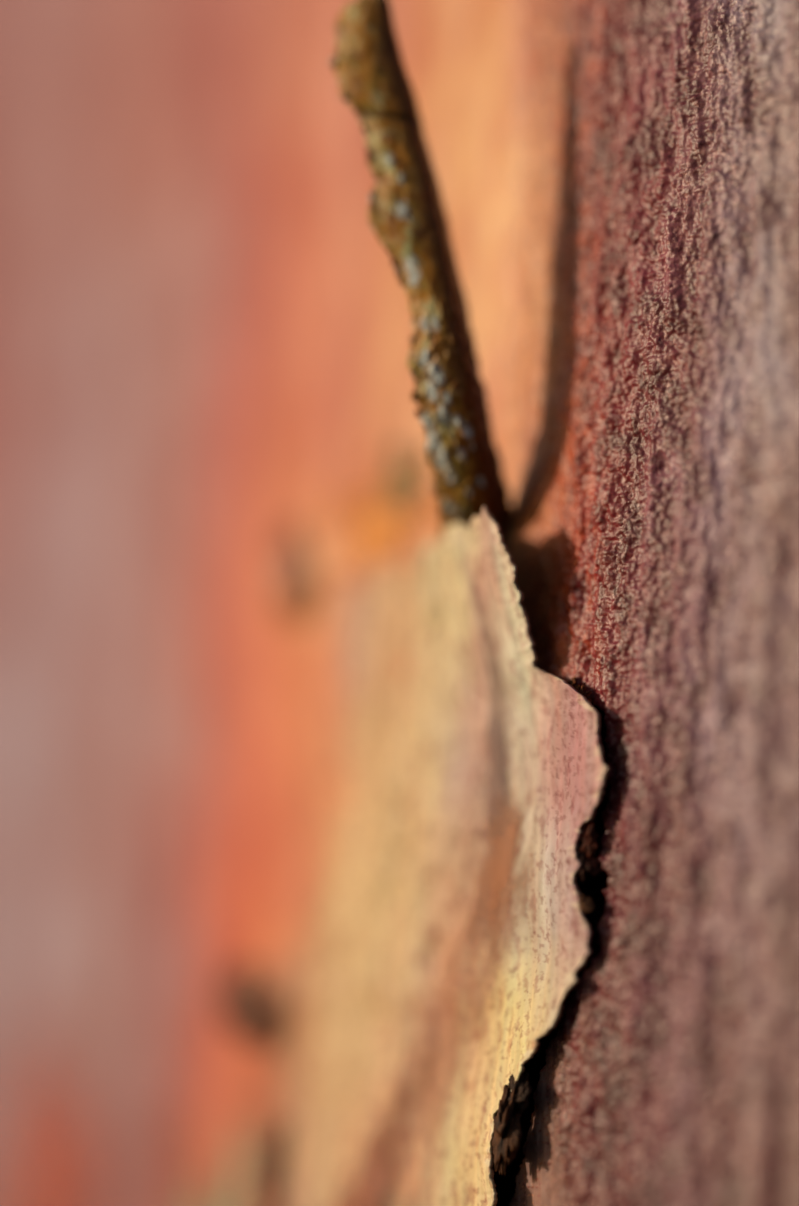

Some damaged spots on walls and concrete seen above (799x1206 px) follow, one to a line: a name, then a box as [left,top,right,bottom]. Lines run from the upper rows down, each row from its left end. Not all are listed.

peeling [567,676,593,704]
peeling [576,823,601,913]
peeling [264,1118,288,1206]
peeling [492,1042,563,1206]